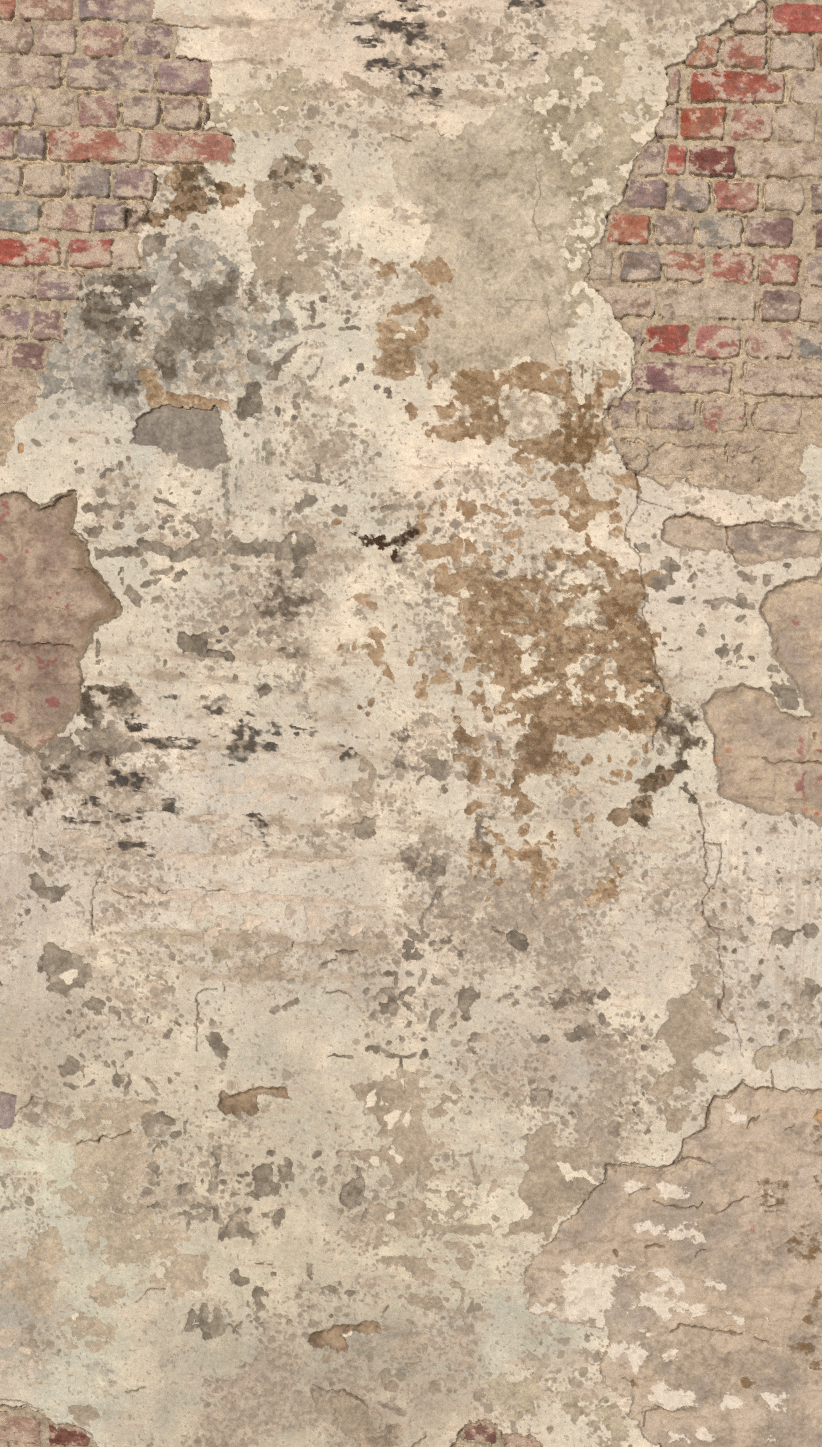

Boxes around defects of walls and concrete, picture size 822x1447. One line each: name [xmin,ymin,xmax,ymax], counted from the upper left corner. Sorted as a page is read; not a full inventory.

crack [0,640,74,648]
crack [0,490,115,600]
crack [623,456,803,752]
peeling [0,943,300,1354]
spalling [307,854,822,1447]
flaking render [0,1330,101,1447]